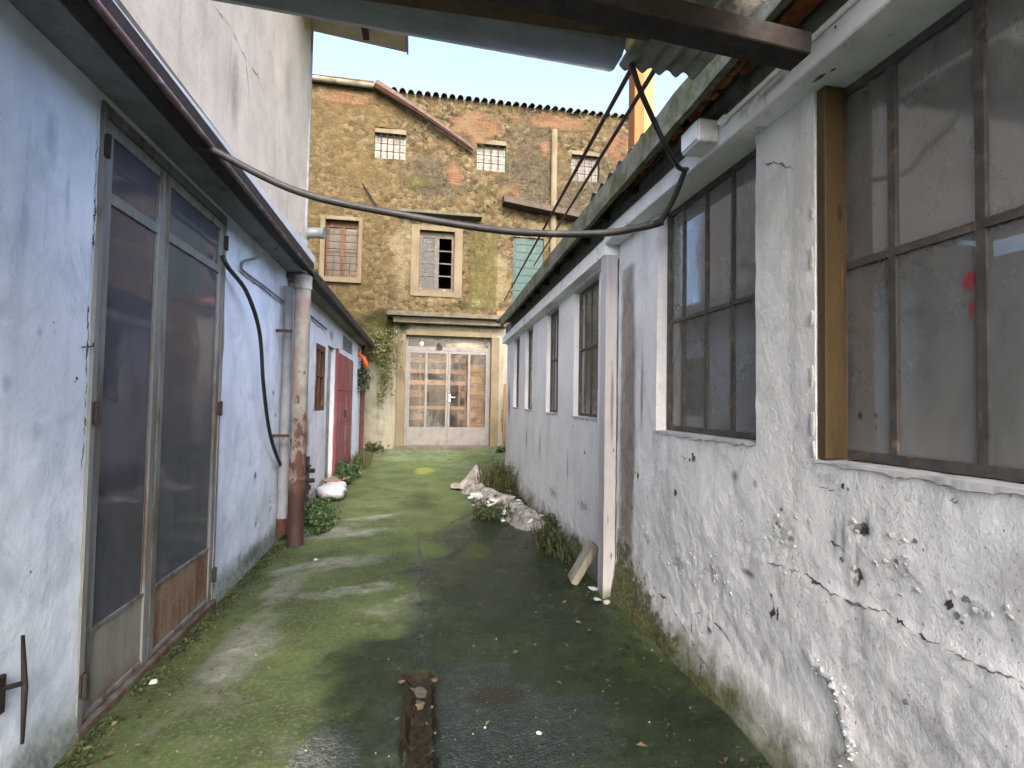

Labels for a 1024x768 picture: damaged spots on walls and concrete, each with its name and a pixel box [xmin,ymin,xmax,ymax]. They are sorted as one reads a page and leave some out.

peeling [764,508,811,547]
spalling [850,519,869,536]
peeling [873,532,918,578]
spalling [852,565,863,587]
crack [768,562,1024,684]
peeling [944,590,1014,625]